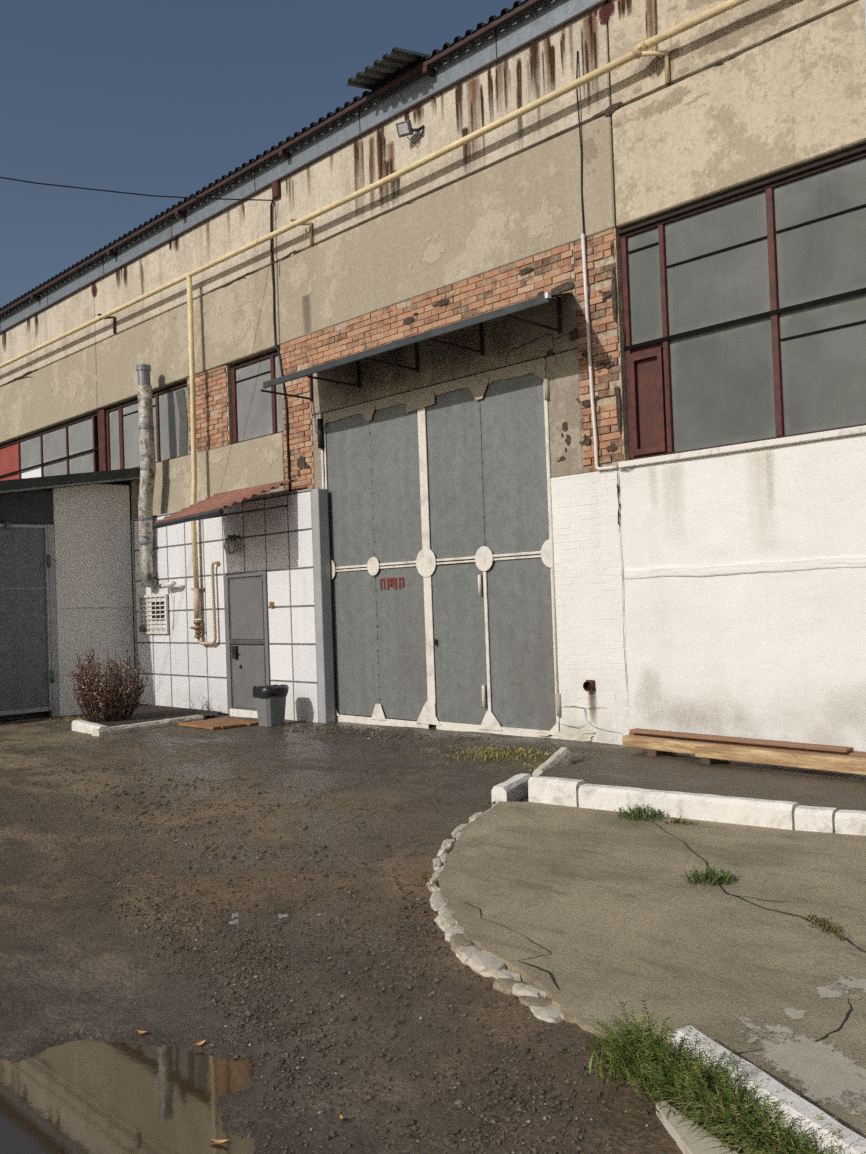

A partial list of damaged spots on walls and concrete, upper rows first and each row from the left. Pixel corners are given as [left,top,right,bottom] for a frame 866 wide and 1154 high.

rust [645,0,657,37]
rust [404,13,597,160]
rust [354,127,399,192]
peeling [256,447,309,477]
crack [618,811,866,952]
crack [464,901,560,990]
crack [806,999,853,1042]
peeling [815,976,866,1000]
peeling [732,1008,866,1134]